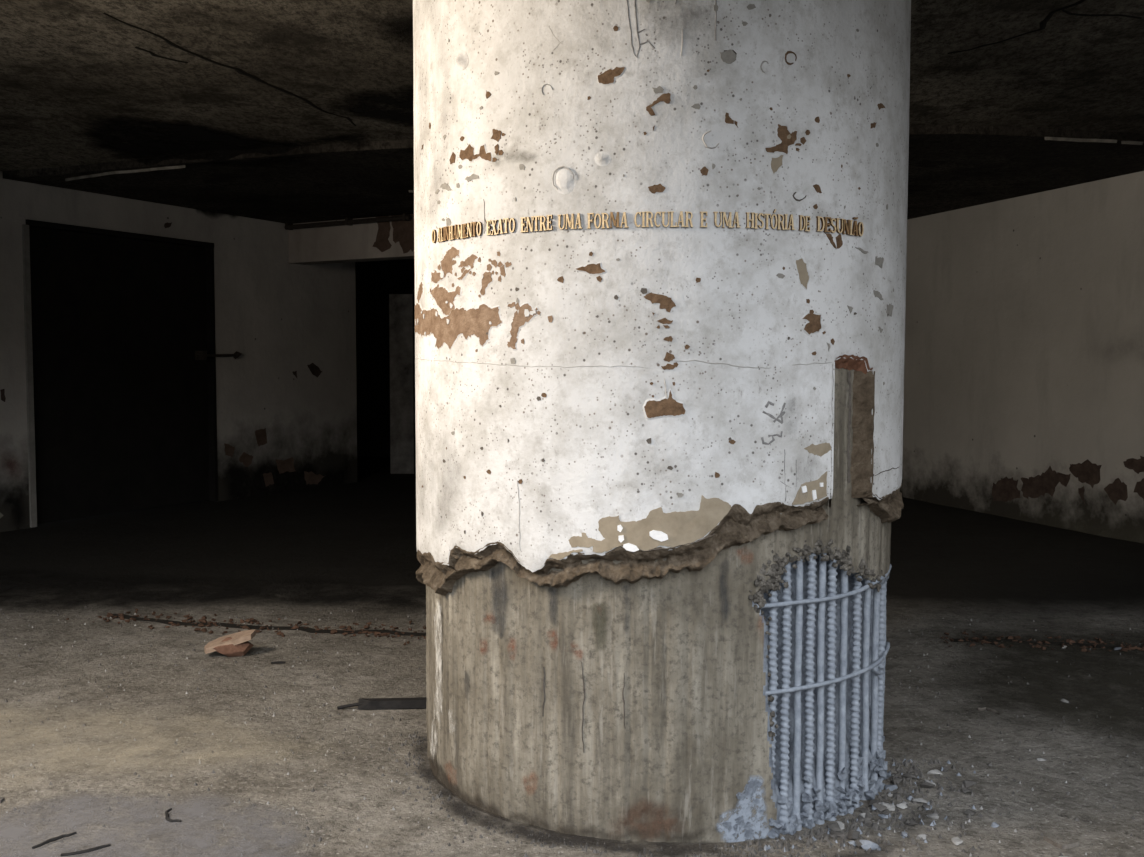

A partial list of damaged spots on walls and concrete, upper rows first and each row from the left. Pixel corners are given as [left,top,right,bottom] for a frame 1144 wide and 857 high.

crack [948,0,1143,54]
crack [103,12,357,126]
peeling [597,66,626,86]
peeling [435,129,505,204]
peeling [764,116,820,176]
peeling [372,214,414,253]
peeling [415,245,553,364]
peeling [641,288,690,420]
flaking render [776,257,904,523]
peeling [992,456,1144,505]
spalling [416,442,892,843]